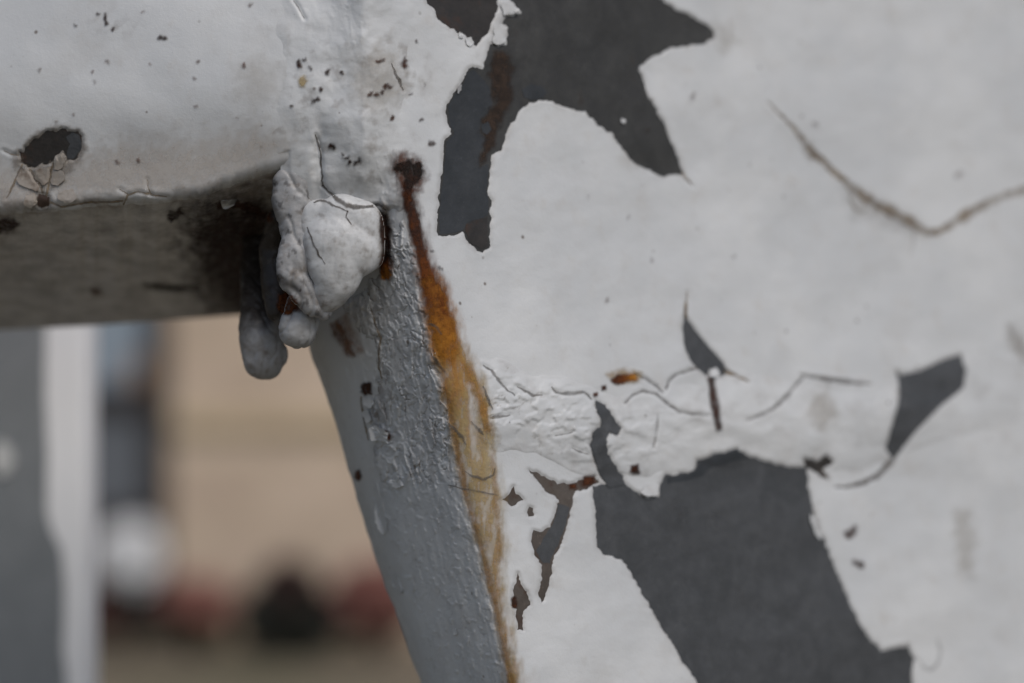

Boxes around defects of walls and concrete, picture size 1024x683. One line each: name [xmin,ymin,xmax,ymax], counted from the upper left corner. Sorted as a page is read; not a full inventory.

peeling [16,128,82,208]
crack [5,151,167,208]
crack [314,134,385,225]
peeling [427,0,714,253]
crack [779,114,1013,235]
corrosion [402,188,518,683]
crack [486,367,592,400]
corrosion [594,371,638,396]
peeling [666,292,749,389]
crack [751,376,872,419]
peeling [502,487,534,516]
peeling [512,354,966,683]